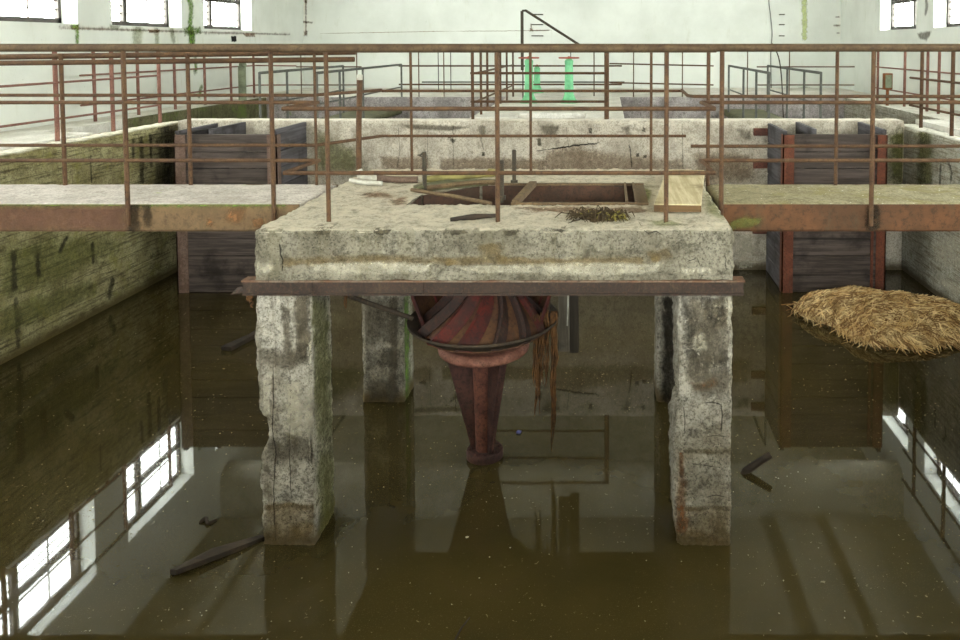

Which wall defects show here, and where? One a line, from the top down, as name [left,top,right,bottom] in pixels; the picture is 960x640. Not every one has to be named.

leakage [187,0,195,44]
crack [538,142,600,151]
rust [0,205,152,231]
rust [865,205,880,231]
leakage [12,252,20,347]
leakage [263,296,313,369]
crack [272,371,292,541]
rust [676,452,689,533]